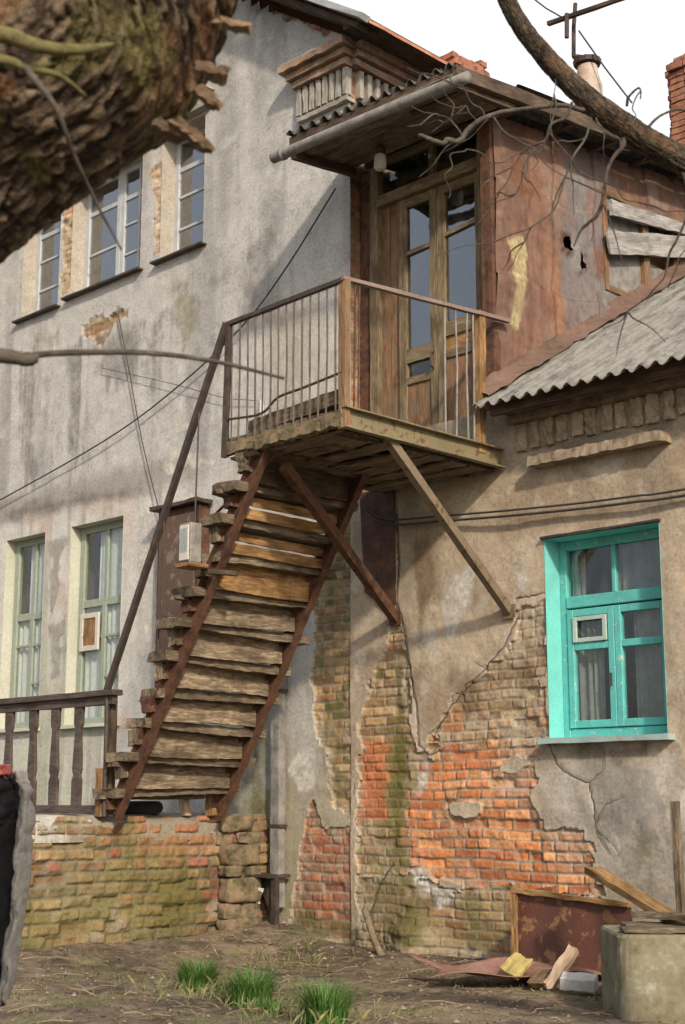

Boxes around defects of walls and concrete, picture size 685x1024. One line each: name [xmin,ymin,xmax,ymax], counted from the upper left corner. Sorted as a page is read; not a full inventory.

flaking render [60,207,73,298]
flaking render [148,159,162,256]
peeling [570,174,587,270]
flaking render [80,305,129,349]
crack [396,514,545,756]
flaking render [288,522,606,958]
crack [549,744,623,854]